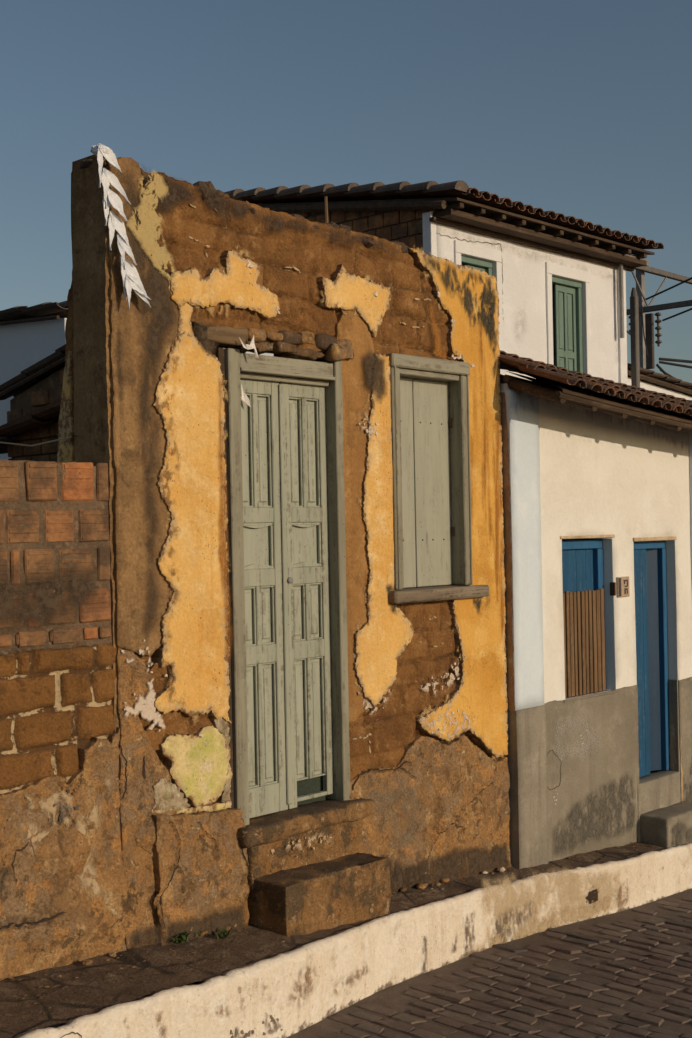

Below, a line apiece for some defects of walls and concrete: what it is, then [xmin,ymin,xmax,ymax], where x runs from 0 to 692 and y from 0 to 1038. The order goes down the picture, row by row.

peeling [127,169,475,368]
leakage [428,258,498,373]
leakage [364,354,385,398]
peeling [358,394,377,438]
peeling [120,639,213,750]
peeling [349,600,470,780]
crack [119,743,146,800]
crack [352,761,417,790]
leakage [554,777,635,853]
crack [0,911,66,932]